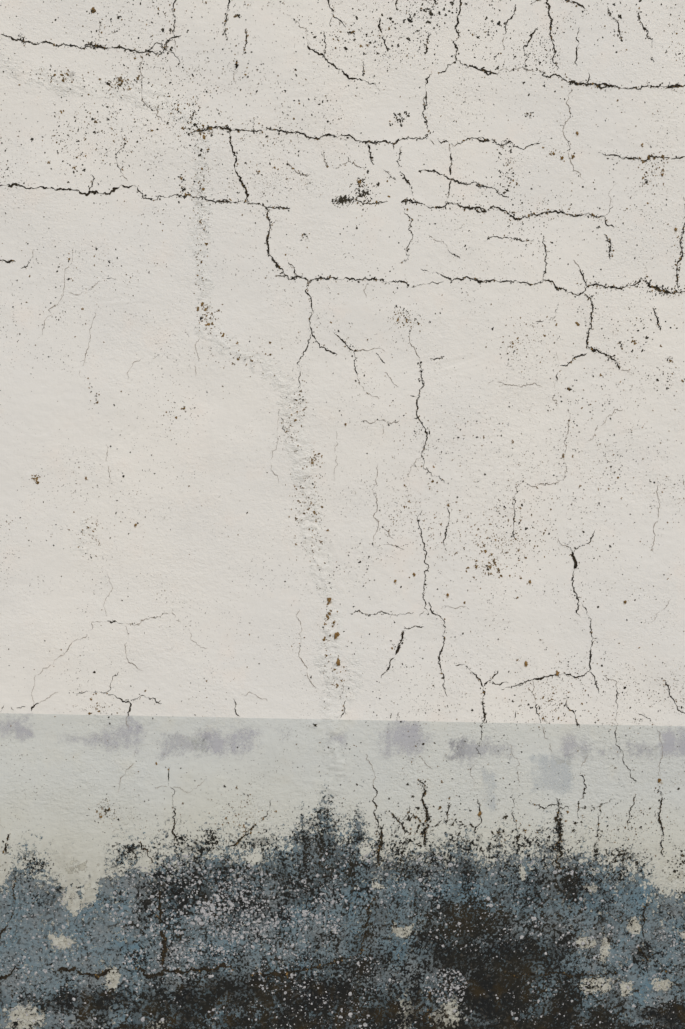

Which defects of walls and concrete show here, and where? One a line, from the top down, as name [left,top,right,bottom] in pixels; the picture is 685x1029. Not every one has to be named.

crack [2,579,206,729]
crack [354,468,665,870]
damp [0,783,685,1029]